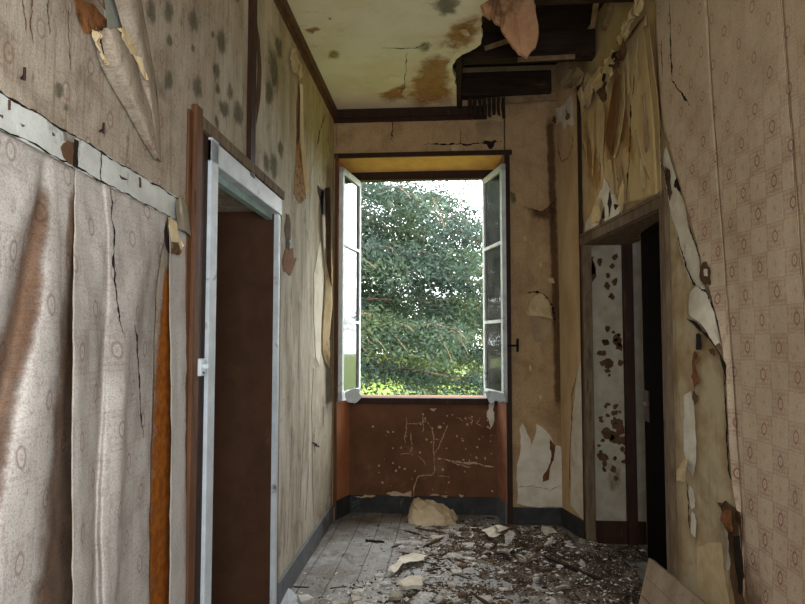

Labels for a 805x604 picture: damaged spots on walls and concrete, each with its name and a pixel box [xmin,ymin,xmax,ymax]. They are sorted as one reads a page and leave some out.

flaking render [74,0,122,33]
leakage [448,19,478,48]
leakage [214,64,243,128]
leakage [266,39,282,103]
leakage [382,56,450,104]
crack [644,5,689,193]
peeling [61,139,79,169]
crack [424,131,502,149]
crack [0,90,178,437]
crack [403,415,493,496]
flaking render [516,362,583,518]
flaking render [683,351,745,604]